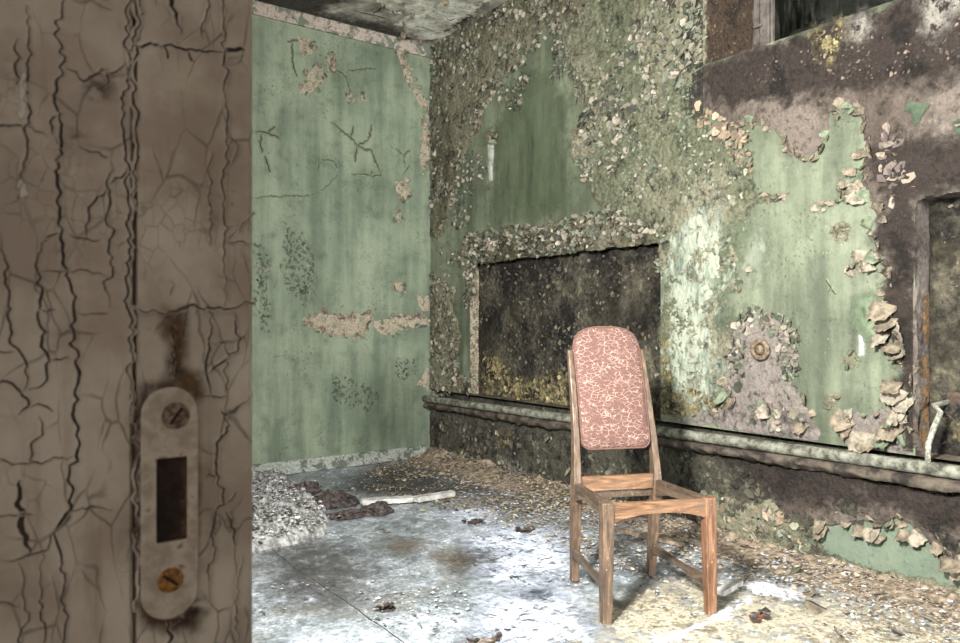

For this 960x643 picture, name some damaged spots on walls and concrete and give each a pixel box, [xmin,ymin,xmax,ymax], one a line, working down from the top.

water stain [256,0,419,40]
mould [665,0,960,118]
rust [134,315,202,429]
crack [0,0,410,643]
peeling [254,0,960,454]
water stain [436,130,960,465]
rust [919,355,930,450]
peeling [429,409,960,594]